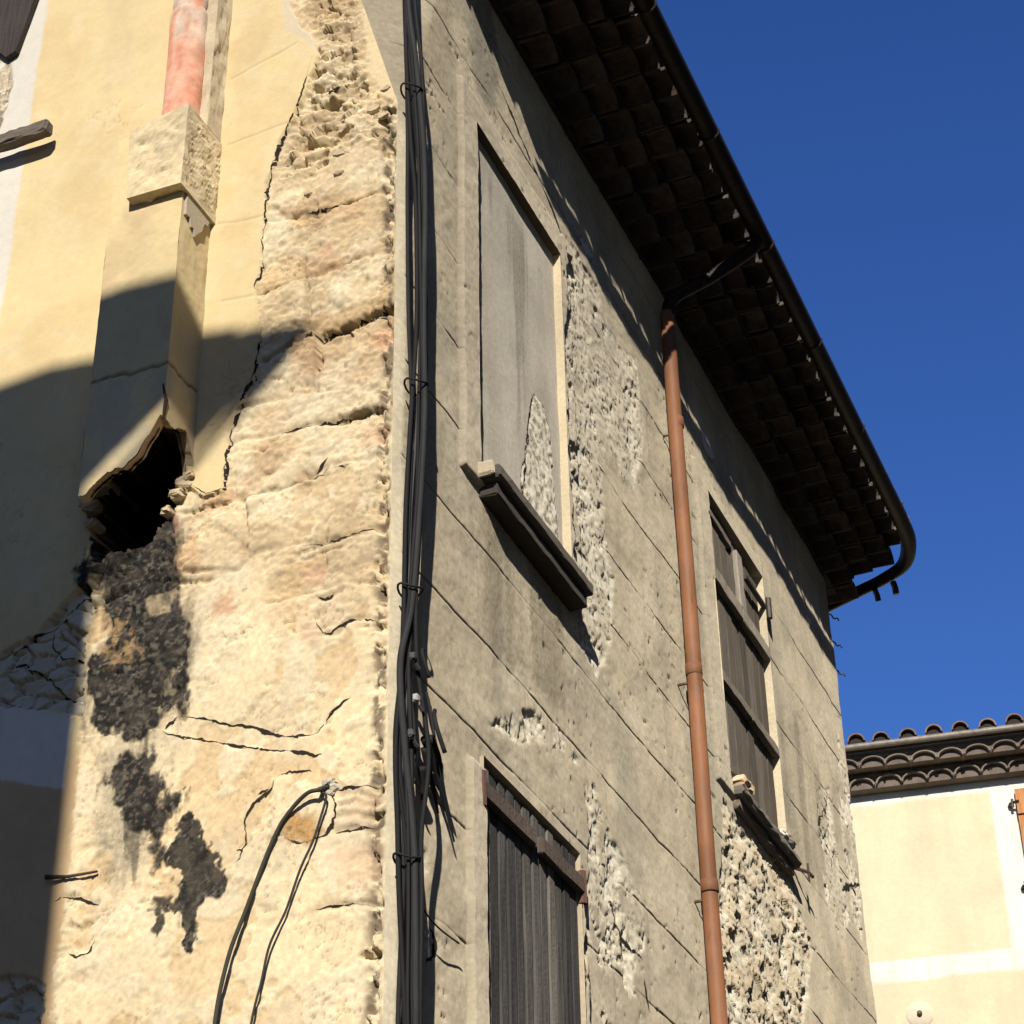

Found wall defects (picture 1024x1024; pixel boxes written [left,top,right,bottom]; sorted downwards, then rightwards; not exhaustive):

crack [254,67,352,288]
spalling [49,0,398,1024]
crack [191,331,262,494]
spalling [521,396,559,540]
spalling [564,237,643,677]
crack [0,589,93,705]
water stain [103,739,185,872]
crack [163,698,349,863]
crack [285,785,378,844]
spalling [493,709,581,765]
spalling [584,781,646,997]
spalling [719,798,814,1024]